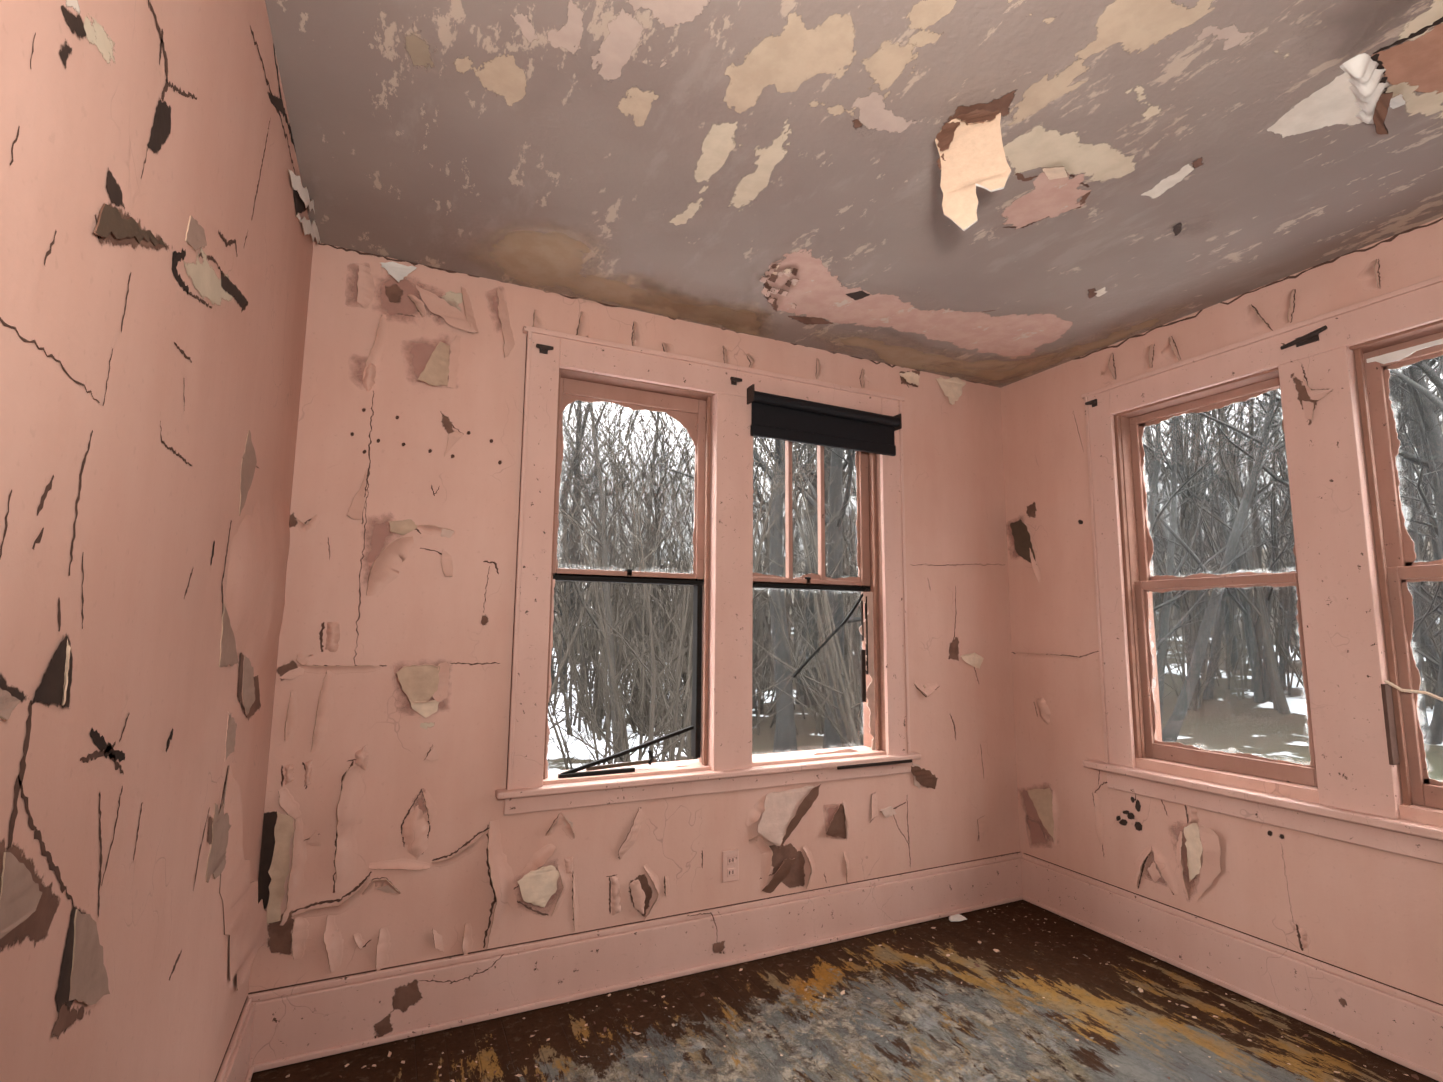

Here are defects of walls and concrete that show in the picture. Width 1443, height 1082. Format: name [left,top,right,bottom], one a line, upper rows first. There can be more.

crack [10,126,20,166]
crack [141,0,197,178]
peeling [935,0,1254,231]
peeling [1267,53,1443,138]
crack [44,231,57,265]
peeling [94,168,248,311]
water stain [492,231,759,335]
peeling [759,249,1073,359]
crack [160,342,192,466]
crack [0,273,143,917]
peeling [193,604,344,990]
peeling [0,778,110,1039]